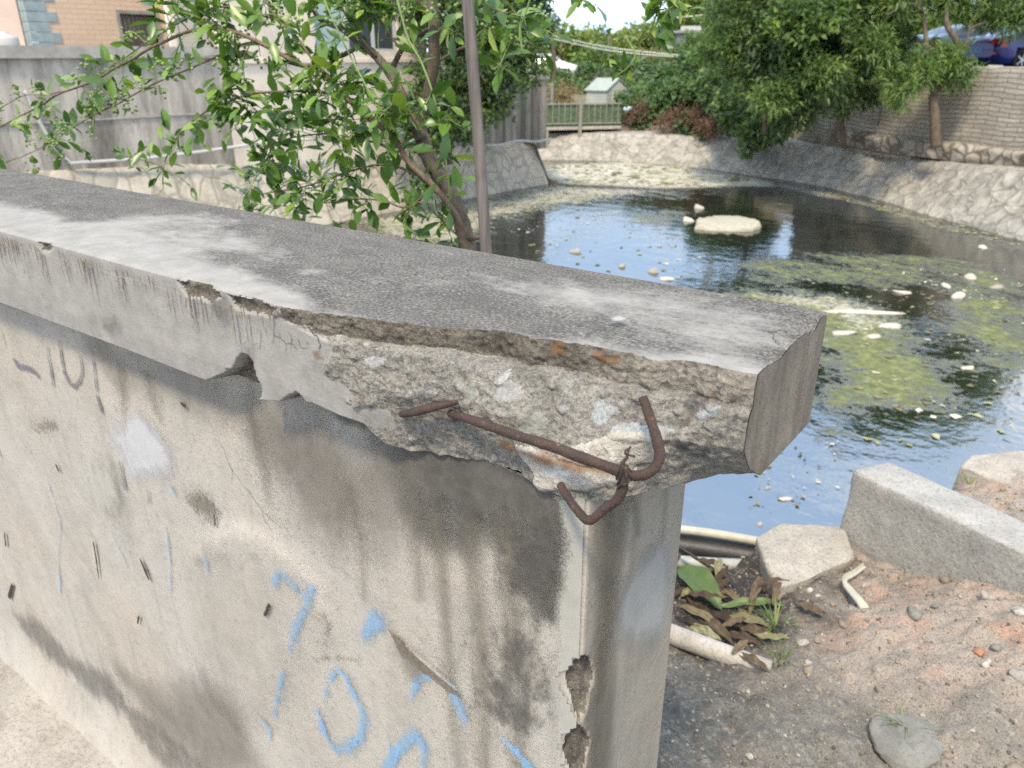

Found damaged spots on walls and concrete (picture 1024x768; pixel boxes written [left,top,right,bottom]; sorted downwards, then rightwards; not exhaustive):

peeling [180,279,283,319]
spalling [303,325,757,501]
rust [531,454,601,471]
water stain [250,416,573,626]
water stain [474,621,551,733]
peeling [562,655,593,768]